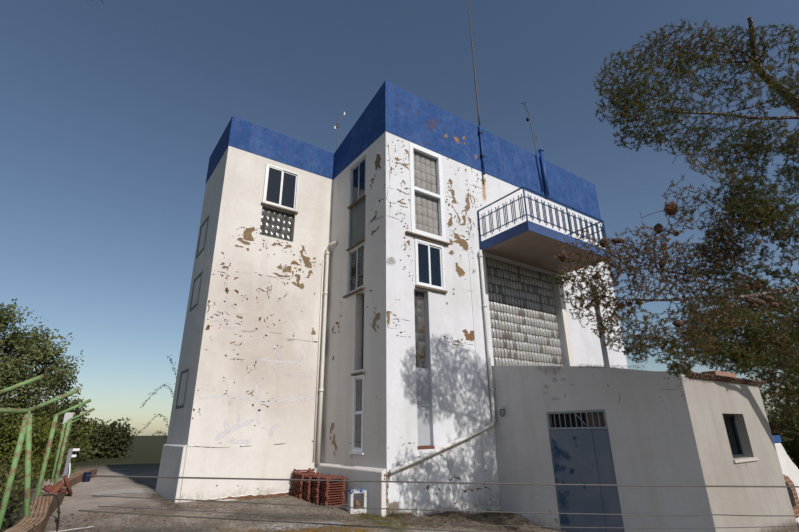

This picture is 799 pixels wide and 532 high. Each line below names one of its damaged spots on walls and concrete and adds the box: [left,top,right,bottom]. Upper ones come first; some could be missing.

peeling [206,252,268,322]
peeling [233,227,321,289]
peeling [367,306,396,333]
peeling [370,140,413,281]
peeling [444,328,475,346]
peeling [445,168,486,280]